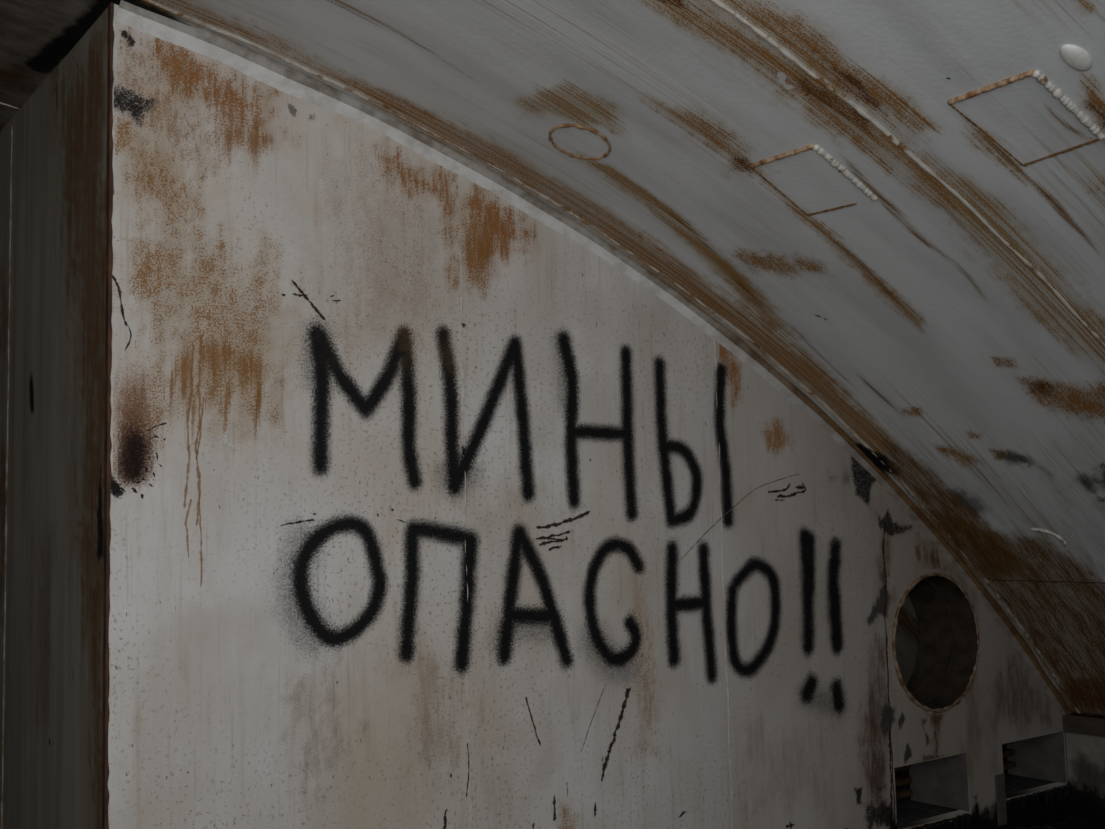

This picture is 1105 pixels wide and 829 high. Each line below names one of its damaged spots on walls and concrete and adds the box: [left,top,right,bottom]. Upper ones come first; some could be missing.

rust [116,122,284,584]
rust [144,0,1030,582]
rust [641,0,1105,423]
rust [863,634,887,806]
spalling [867,586,890,624]
spalling [875,511,912,536]